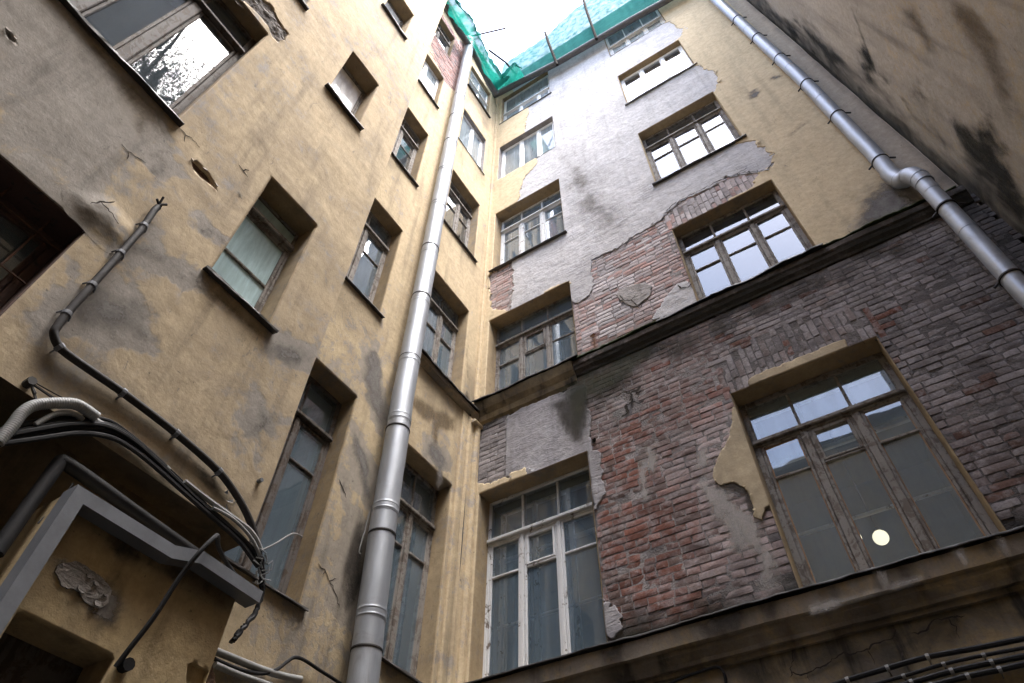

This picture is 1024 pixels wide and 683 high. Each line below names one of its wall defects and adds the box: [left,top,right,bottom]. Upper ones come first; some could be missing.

flaking render [235,0,288,42]
flaking render [430,15,464,91]
leakage [787,22,843,64]
leakage [859,49,873,82]
leakage [955,7,993,63]
crack [90,201,118,223]
flaking render [191,158,218,187]
flaking render [489,21,775,356]
leakage [860,183,915,225]
leakage [954,124,1024,219]
flaking render [962,193,1024,271]
flaking render [477,217,1024,642]